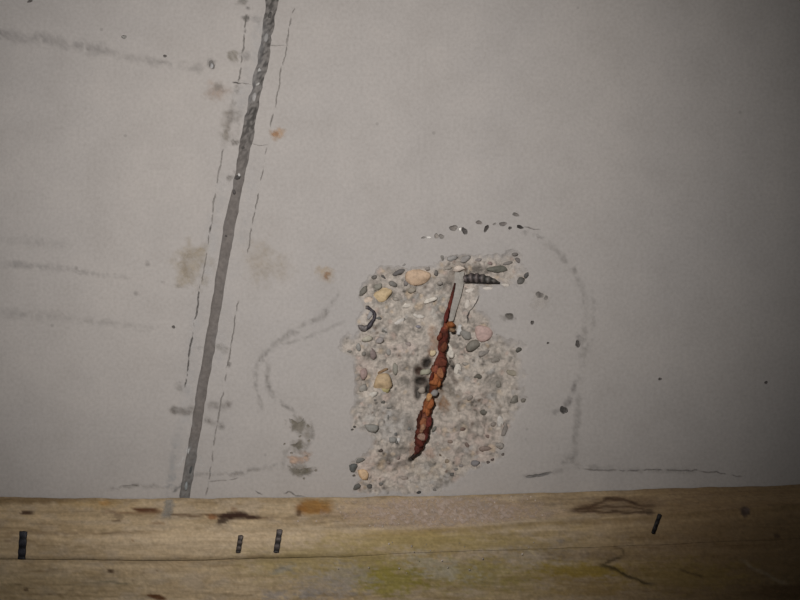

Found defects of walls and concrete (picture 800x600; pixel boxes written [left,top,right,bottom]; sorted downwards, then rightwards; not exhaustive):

spalling [337,249,531,496]
rust [415,307,456,454]